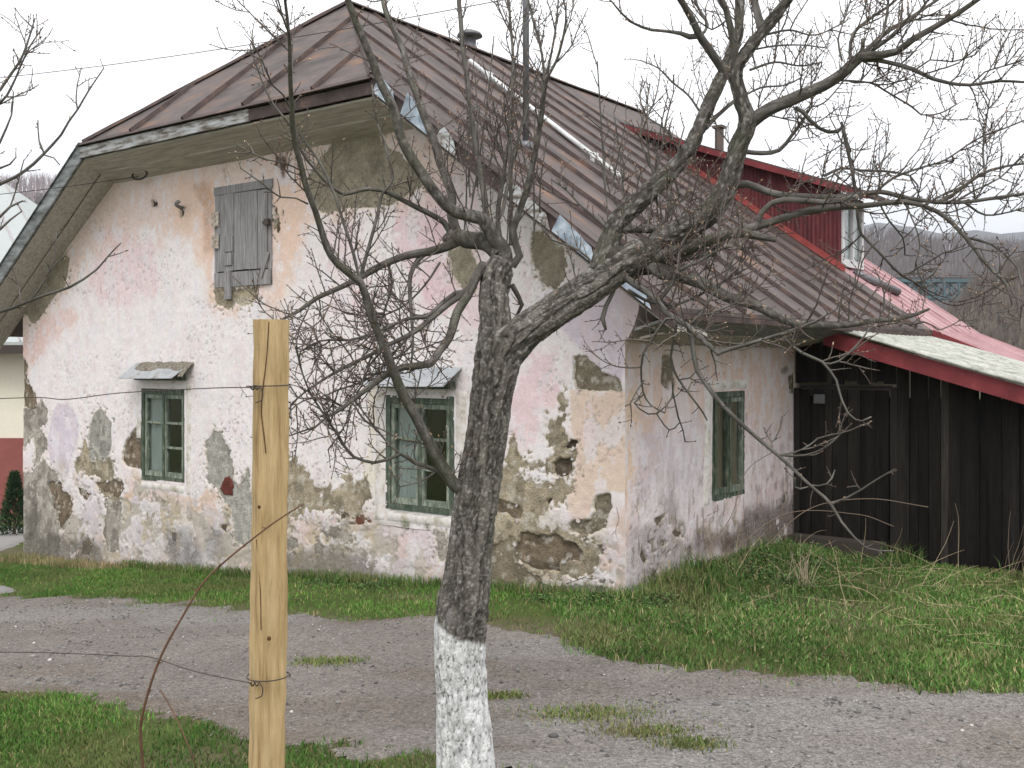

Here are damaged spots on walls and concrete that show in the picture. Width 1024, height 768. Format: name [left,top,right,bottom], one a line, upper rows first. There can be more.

flaking render [308,134,423,219]
flaking render [448,246,478,293]
flaking render [531,231,568,290]
flaking render [23,358,141,557]
spalling [204,431,252,551]
peeling [287,455,374,556]
flaking render [494,356,622,593]